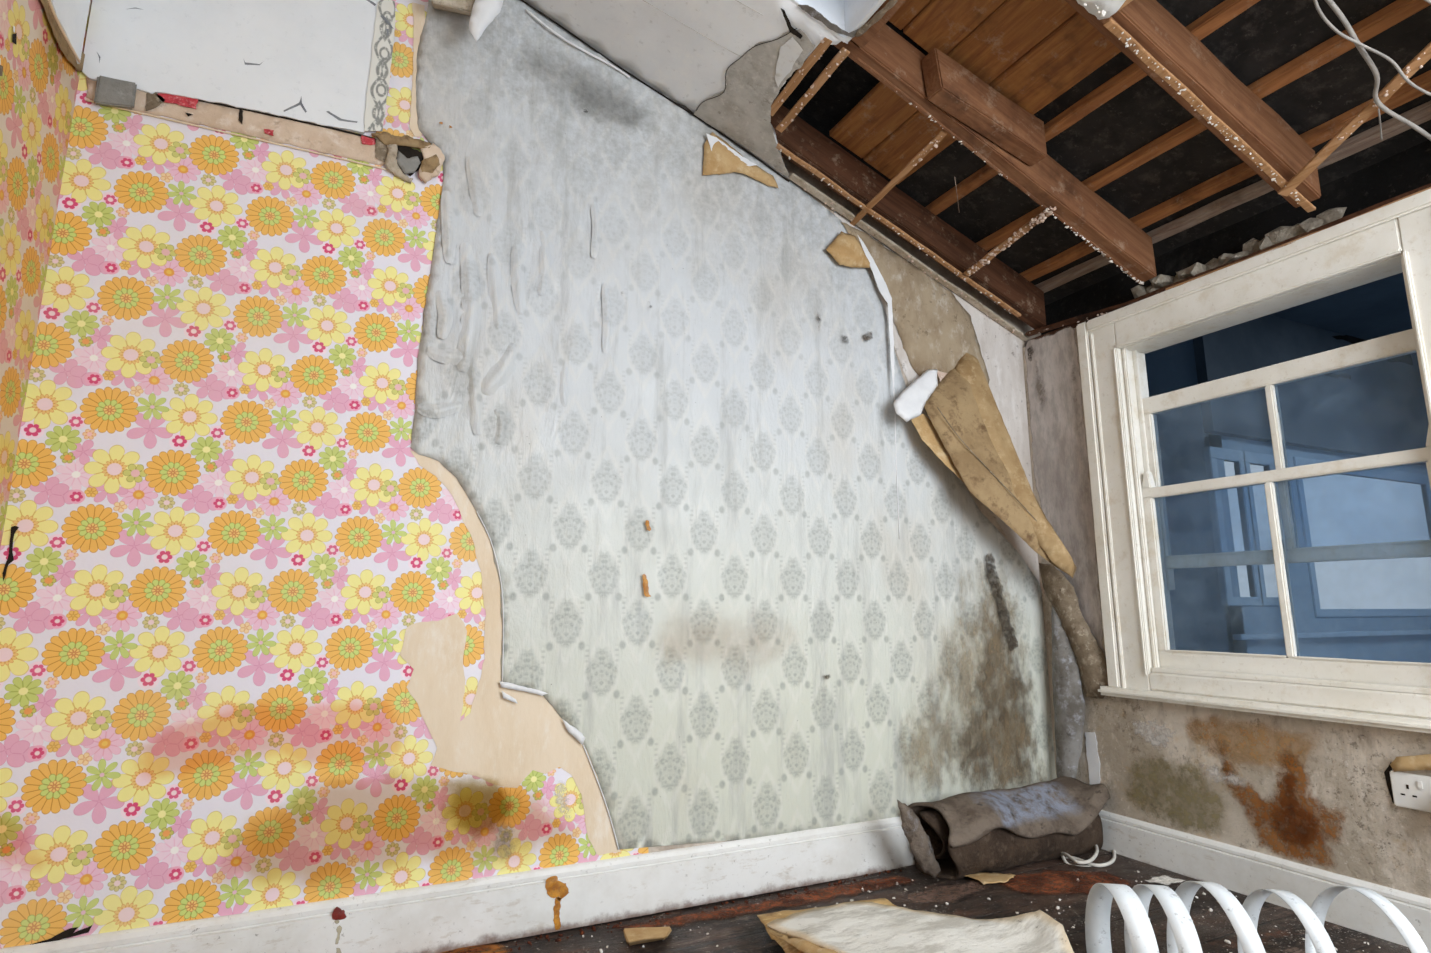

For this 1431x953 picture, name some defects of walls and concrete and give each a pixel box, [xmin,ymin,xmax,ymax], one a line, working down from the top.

flaking render [40,0,445,184]
peeling [826,210,1077,583]
spalling [1332,335,1367,344]
spalling [1386,354,1413,365]
leakage [911,327,1108,789]
peeling [400,450,621,855]
rust [1221,750,1345,865]